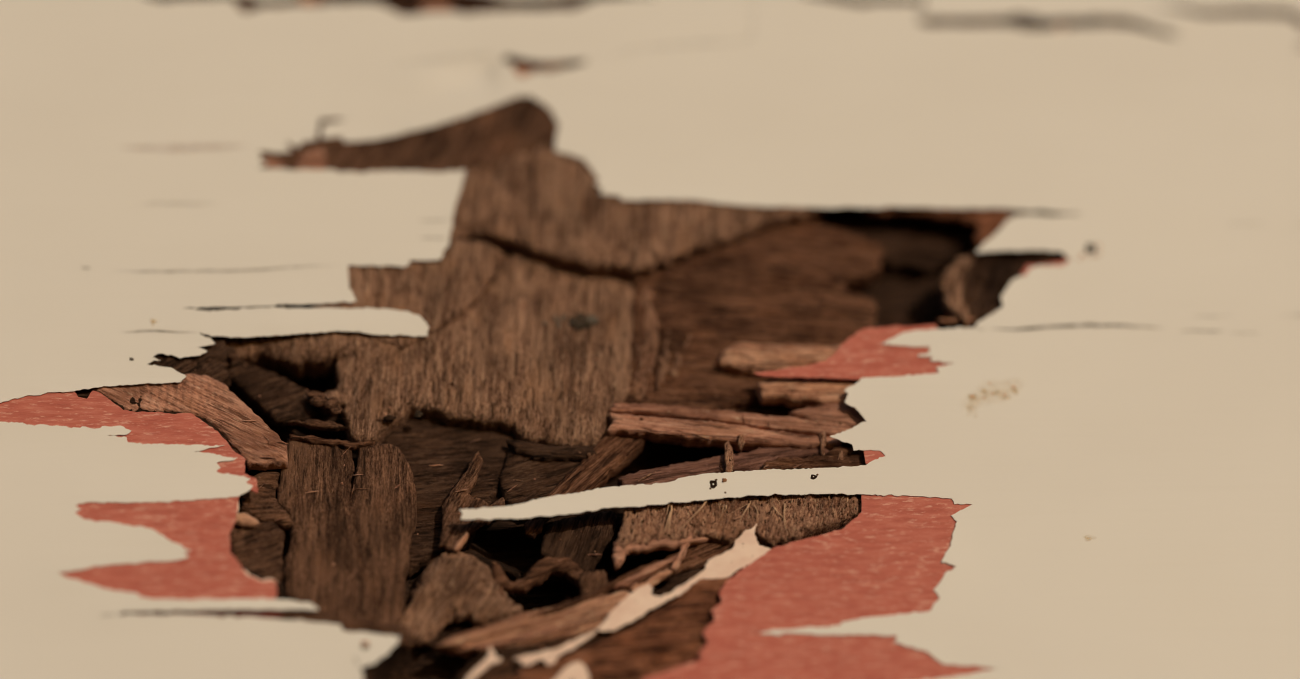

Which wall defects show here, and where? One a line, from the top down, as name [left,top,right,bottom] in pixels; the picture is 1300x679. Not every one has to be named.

peeling [754,324,952,381]
peeling [724,434,745,472]
peeling [864,450,885,465]
peeling [0,391,283,619]
peeling [643,495,995,679]